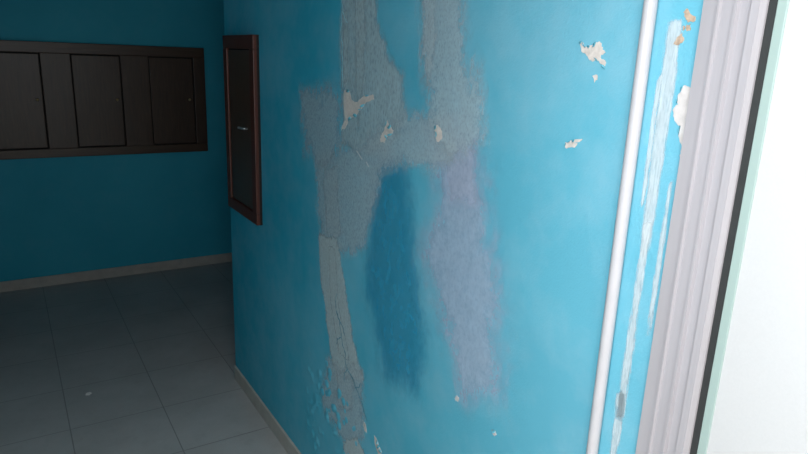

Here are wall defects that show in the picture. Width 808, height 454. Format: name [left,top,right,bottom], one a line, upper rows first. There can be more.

peeling [579,41,606,83]
peeling [340,89,374,131]
peeling [673,85,690,145]